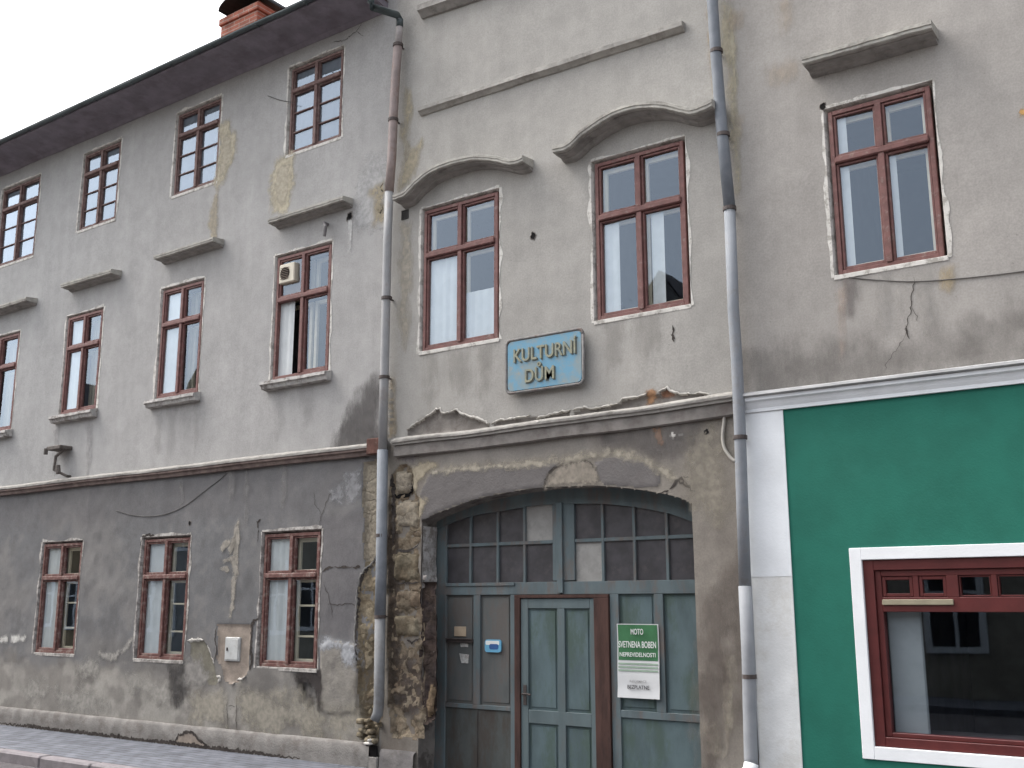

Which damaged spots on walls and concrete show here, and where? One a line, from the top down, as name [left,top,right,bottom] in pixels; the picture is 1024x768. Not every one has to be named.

peeling [208,121,236,237]
crack [884,280,918,373]
water stain [335,378,379,447]
flaking render [407,386,710,436]
spalling [184,521,258,687]
crack [323,565,360,618]
spalling [353,448,676,768]